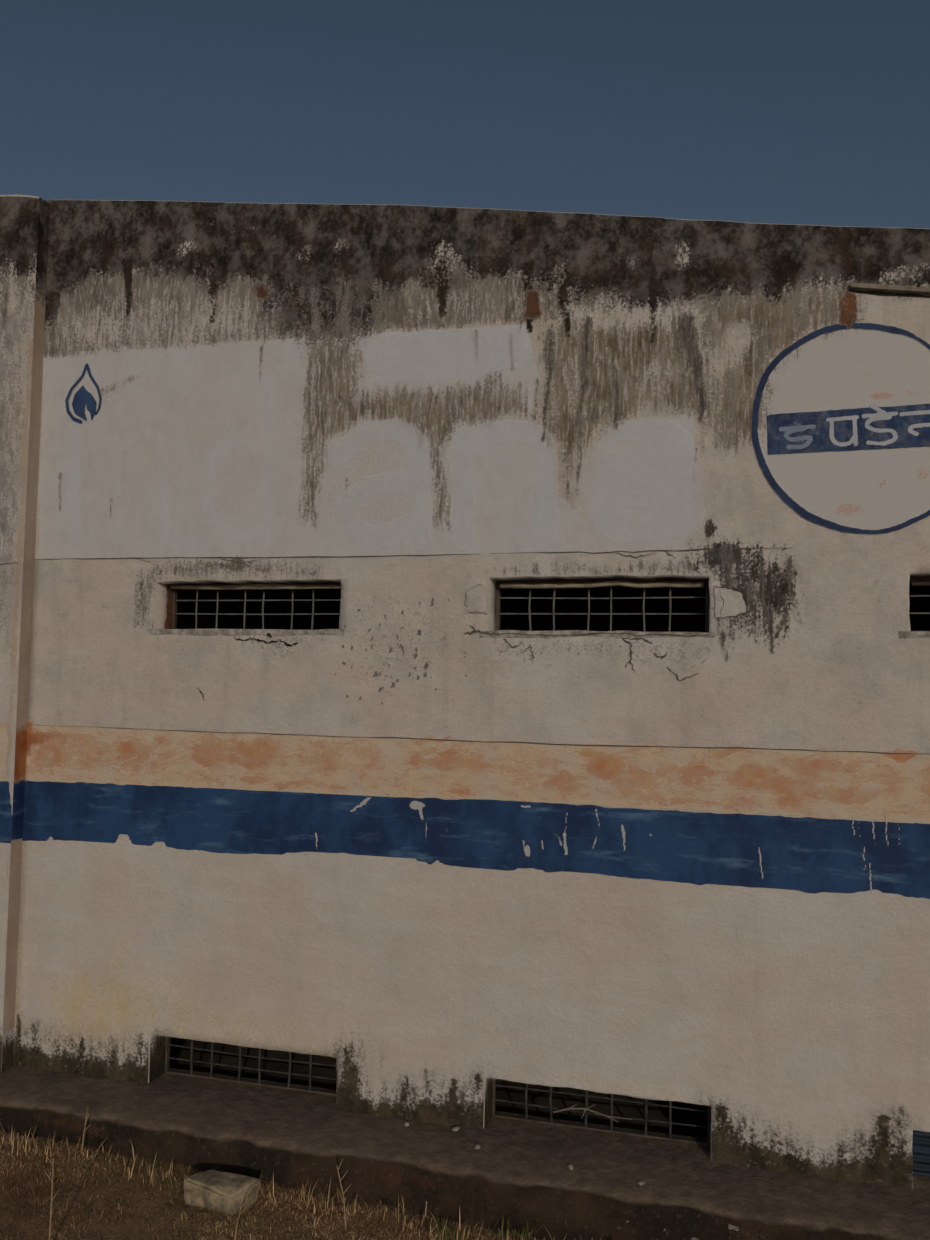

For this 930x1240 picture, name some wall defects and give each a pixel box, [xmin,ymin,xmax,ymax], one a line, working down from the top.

corrosion [520,290,541,329]
water stain [0,196,930,627]
water stain [533,519,802,660]
peeling [27,732,380,812]
peeling [396,737,930,893]
water stain [0,1015,166,1084]
water stain [325,1041,493,1130]
water stain [700,1099,913,1190]